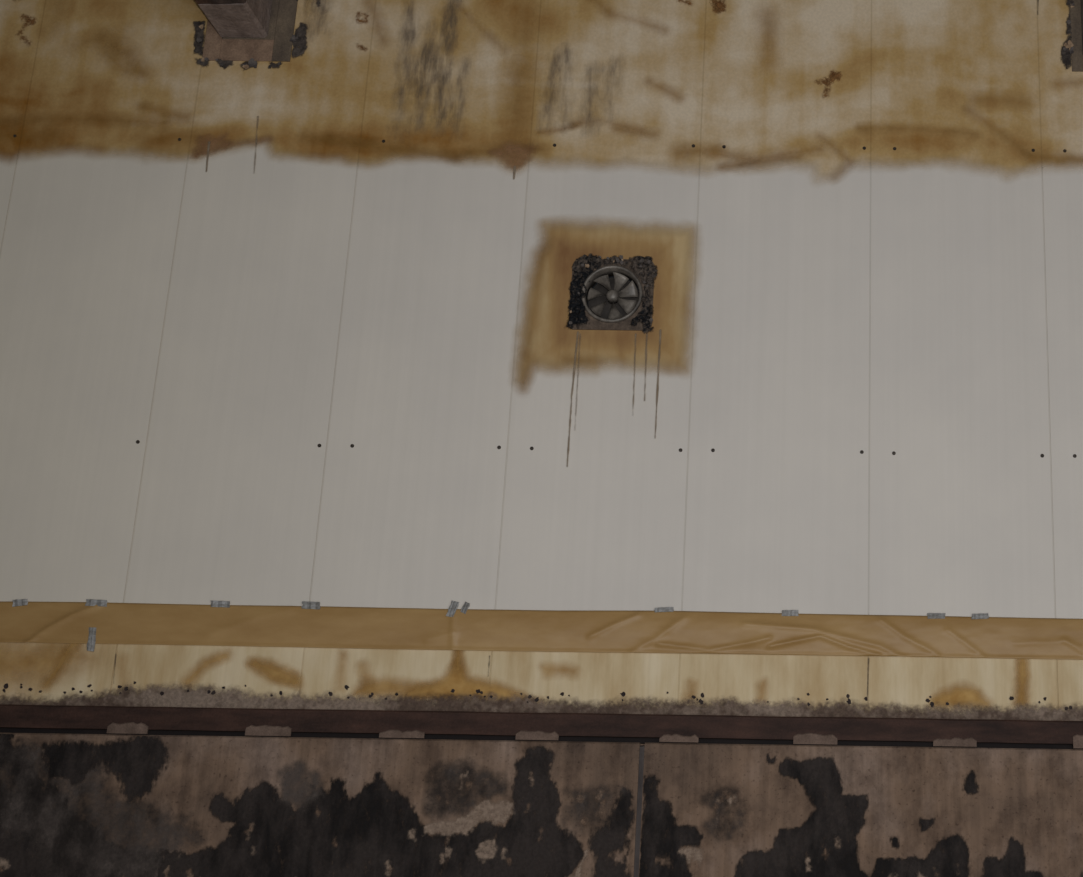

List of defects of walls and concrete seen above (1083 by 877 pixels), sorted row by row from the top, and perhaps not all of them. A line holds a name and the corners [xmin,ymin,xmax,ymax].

water stain [567,332,581,467]
water stain [633,330,661,433]
water stain [251,660,298,684]
water stain [355,650,526,700]
water stain [932,687,989,706]
water stain [1017,659,1027,704]